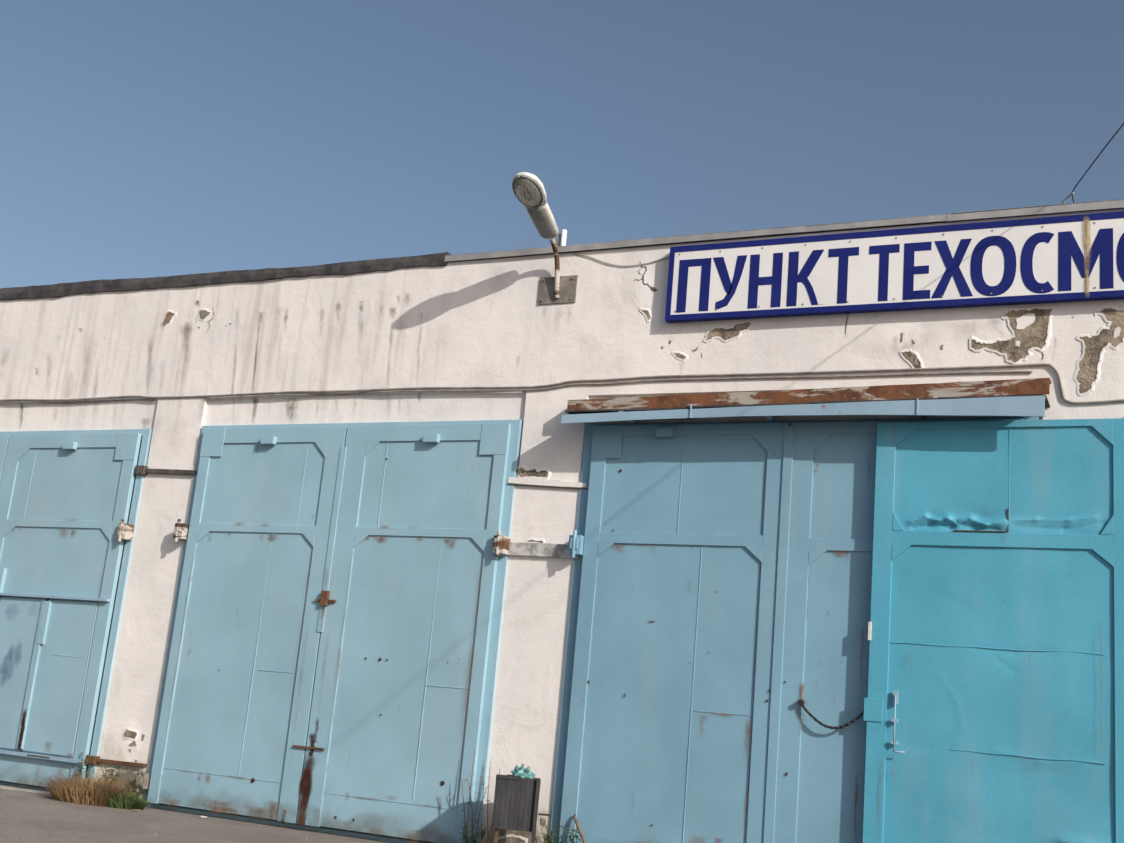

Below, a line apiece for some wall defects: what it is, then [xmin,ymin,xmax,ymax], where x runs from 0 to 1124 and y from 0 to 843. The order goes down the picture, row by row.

flaking render [661,319,754,362]
flaking render [968,305,1055,365]
flaking render [1072,305,1124,397]
rust [258,722,327,826]